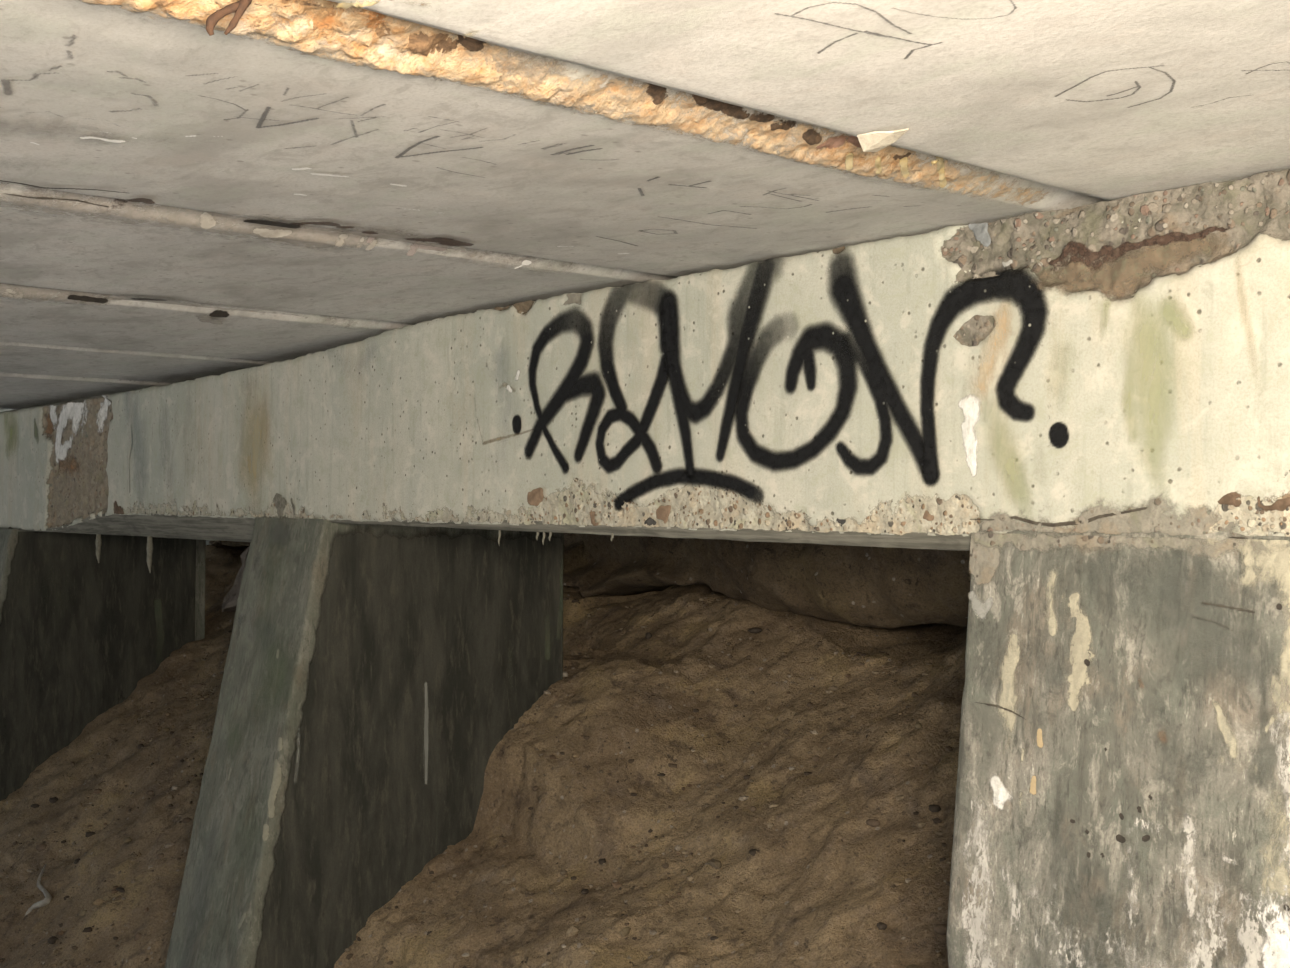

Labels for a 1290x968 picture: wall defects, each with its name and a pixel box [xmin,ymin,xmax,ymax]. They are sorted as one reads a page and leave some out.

corrosion [81,0,1048,205]
spalling [941,169,1290,301]
spalling [42,395,981,536]
peeling [262,737,283,841]
damp [960,776,1037,968]
damp [1035,902,1095,968]
damp [1181,712,1290,968]